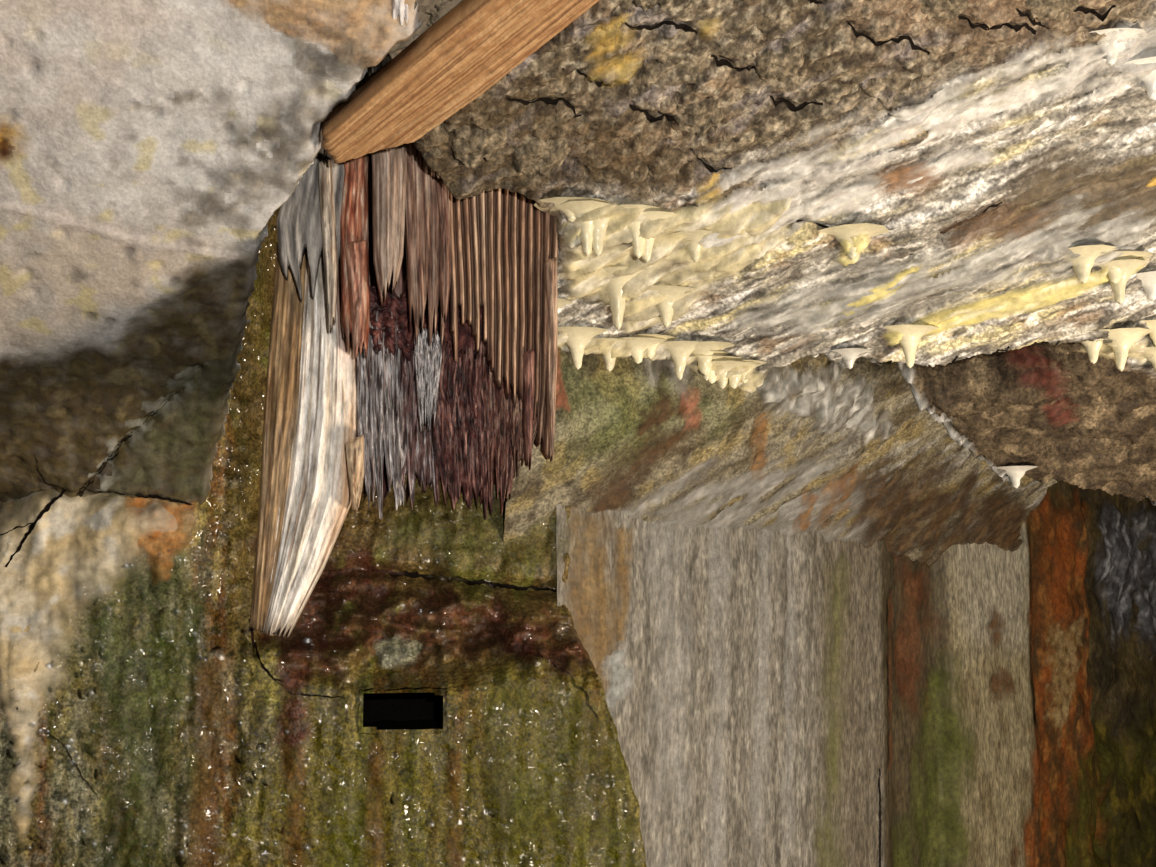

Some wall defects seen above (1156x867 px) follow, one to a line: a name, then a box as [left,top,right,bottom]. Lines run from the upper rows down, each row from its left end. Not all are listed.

damp [233,0,415,95]
crack [625,20,755,72]
crack [847,22,930,55]
crack [959,9,1049,35]
crack [1074,5,1116,22]
crack [577,70,675,123]
corrosion [0,126,19,158]
damp [186,102,322,224]
damp [534,22,1156,566]
crack [0,365,202,567]
corrosion [127,496,190,581]
corrosion [1025,494,1111,867]